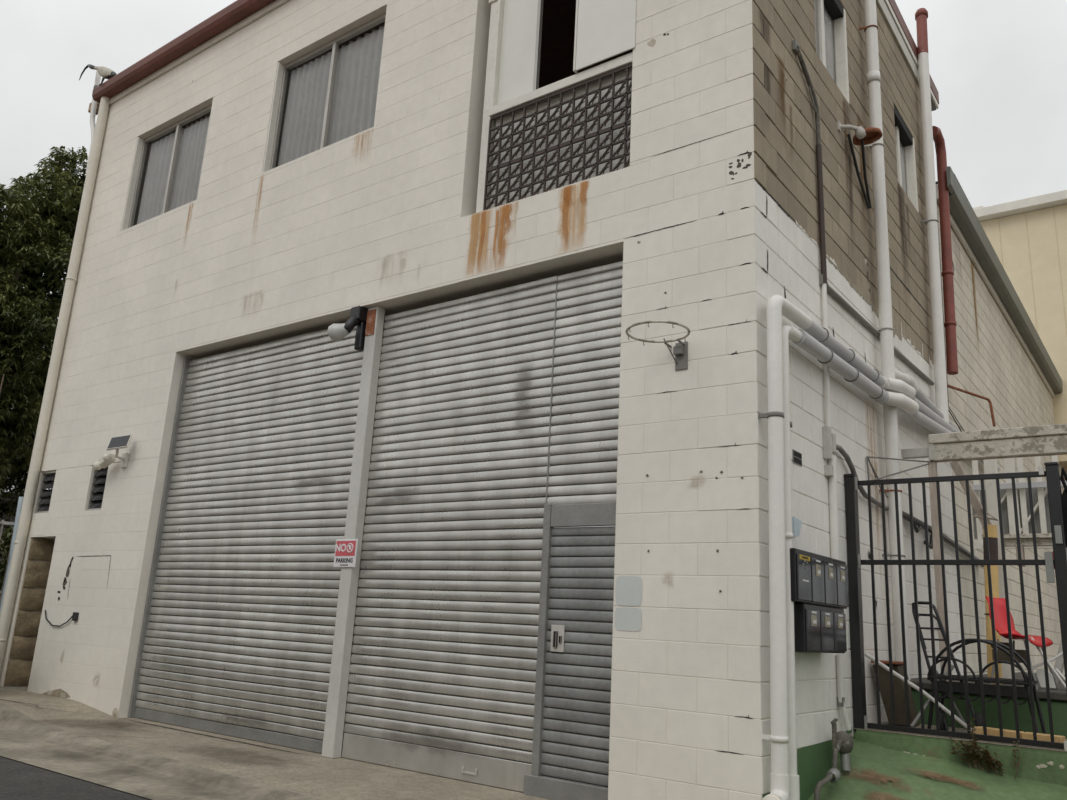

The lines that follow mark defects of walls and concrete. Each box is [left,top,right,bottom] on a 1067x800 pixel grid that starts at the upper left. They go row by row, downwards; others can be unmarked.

spalling [729,152,752,180]
corrosion [469,204,511,260]
corrosion [561,181,587,236]
peeling [796,221,879,318]